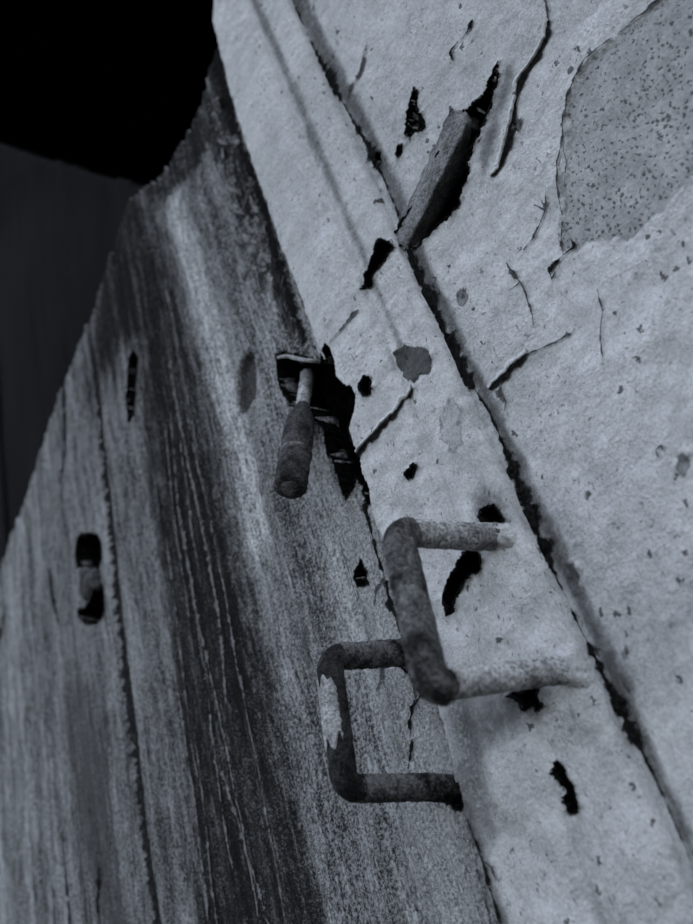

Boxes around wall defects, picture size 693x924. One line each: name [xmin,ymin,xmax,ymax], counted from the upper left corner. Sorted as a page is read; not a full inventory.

spalling [403,86,426,139]
peeling [558,0,693,252]
crack [294,0,693,867]
spalling [505,688,544,715]
spalling [548,760,579,816]
crack [467,819,501,924]